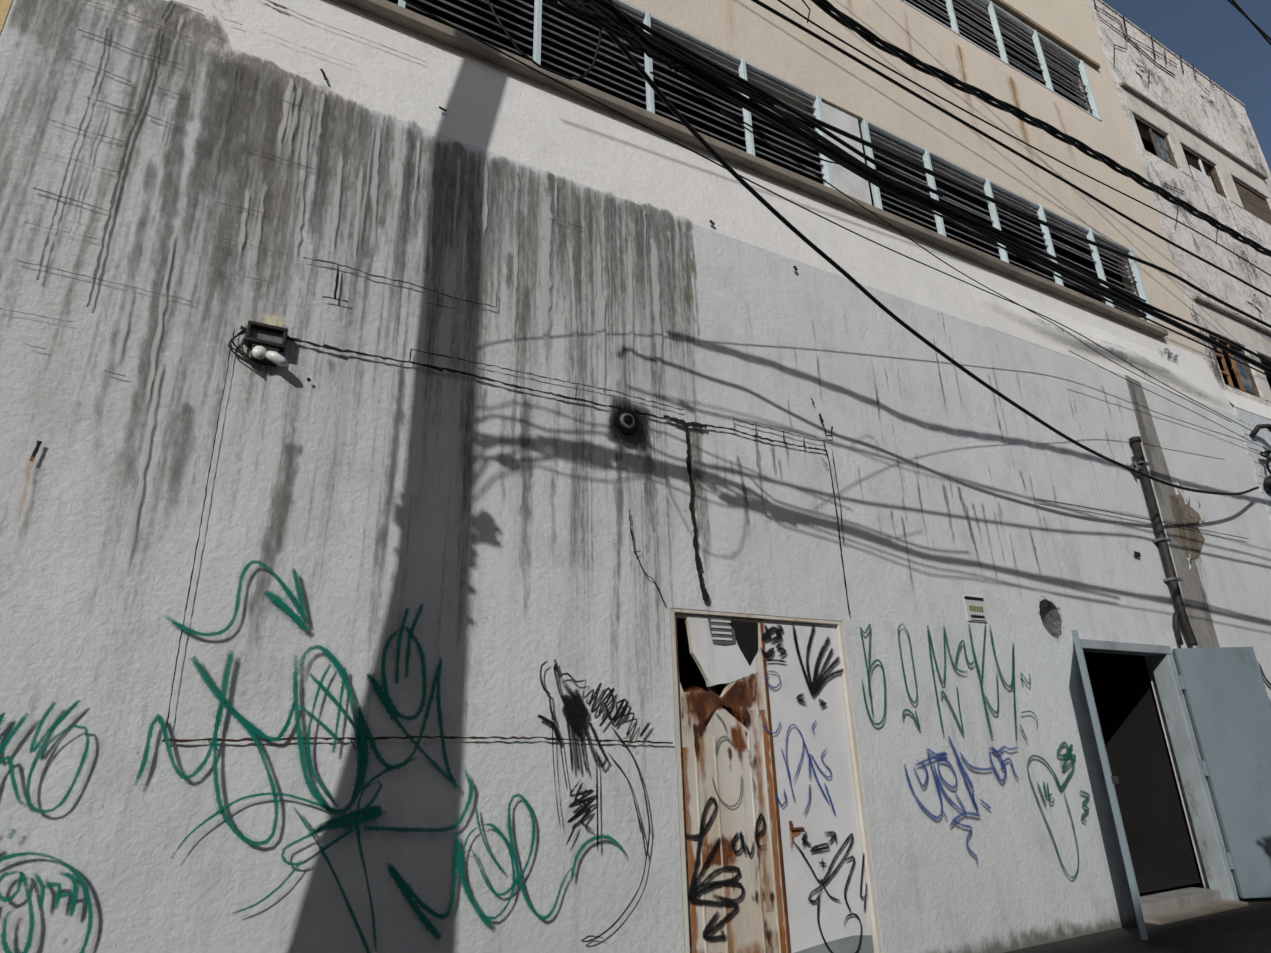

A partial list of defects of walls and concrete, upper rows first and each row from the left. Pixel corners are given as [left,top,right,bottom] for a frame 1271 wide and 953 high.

water stain [1,0,696,574]
water stain [249,428,301,613]
crack [287,336,850,615]
peeling [1125,375,1220,648]
rust [681,675,800,953]